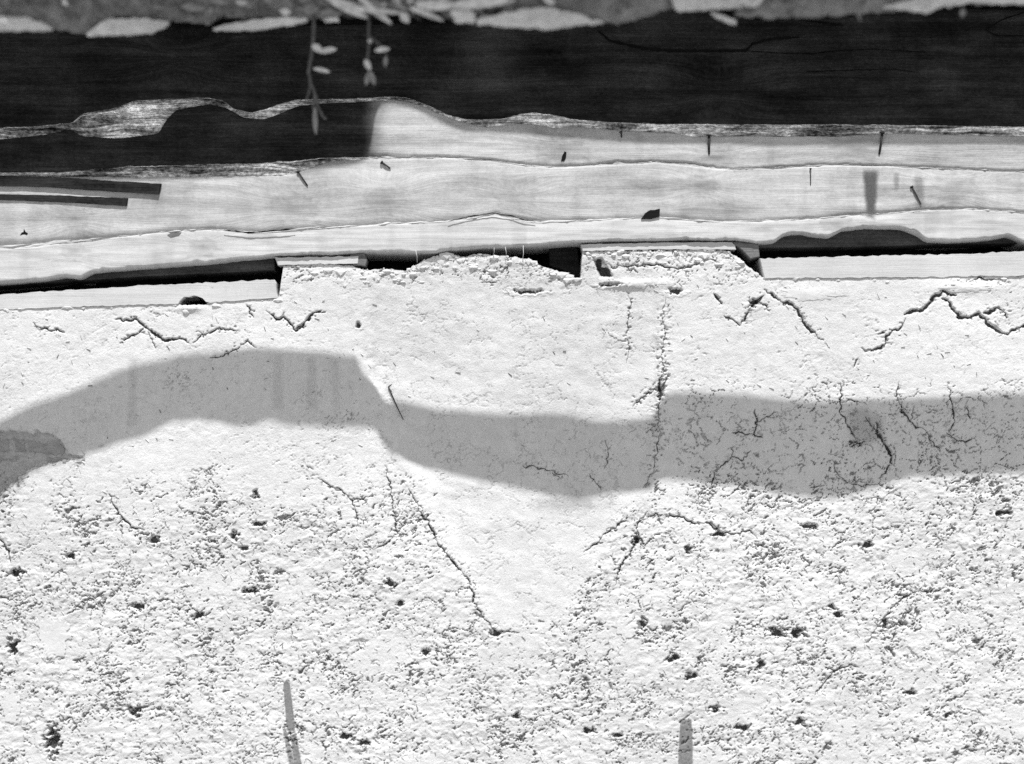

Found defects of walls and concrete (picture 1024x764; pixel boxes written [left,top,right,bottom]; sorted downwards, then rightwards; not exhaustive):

spalling [350,253,368,268]
flaking render [596,259,680,294]
crack [115,304,325,358]
crack [713,289,824,341]
crack [633,299,669,488]
crack [810,276,1024,488]
crack [711,410,775,485]
crack [320,467,517,633]
crack [585,513,758,585]